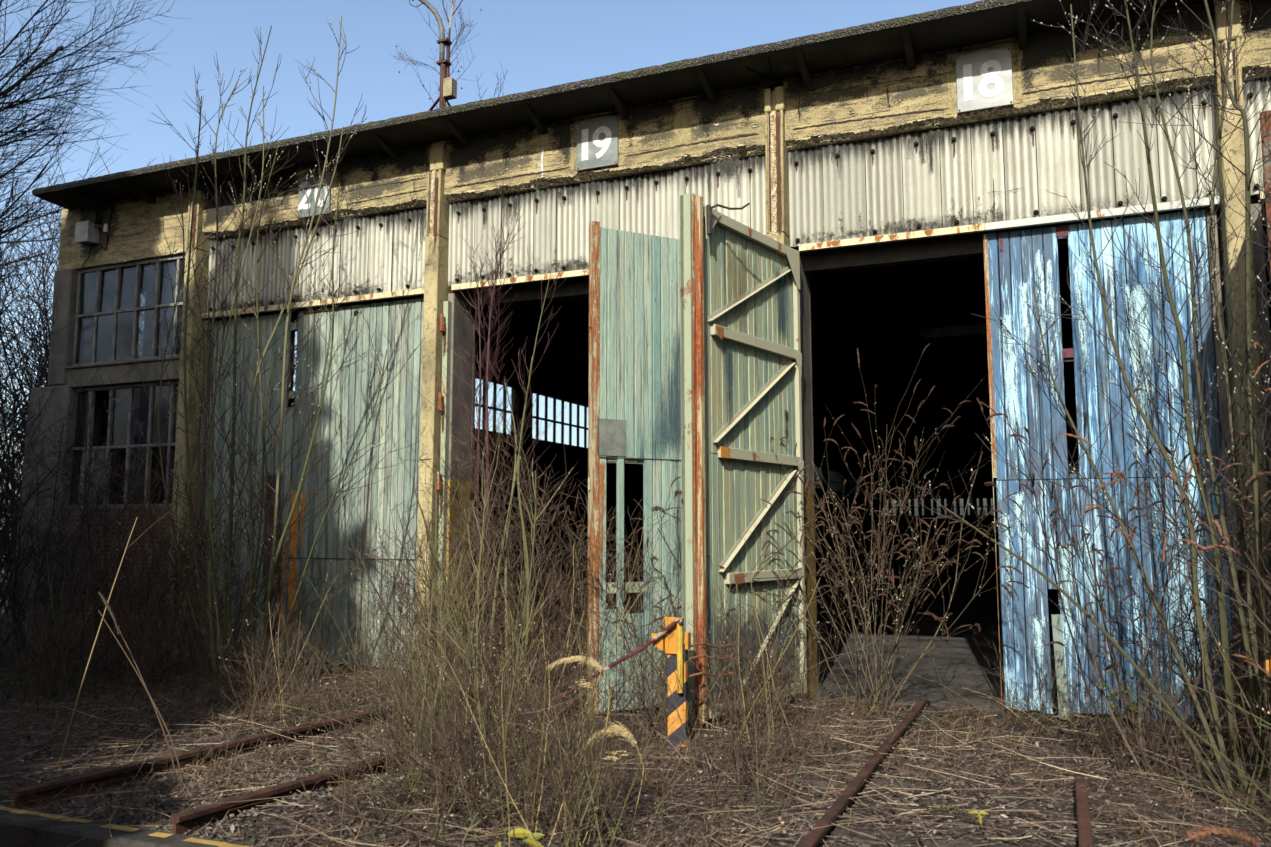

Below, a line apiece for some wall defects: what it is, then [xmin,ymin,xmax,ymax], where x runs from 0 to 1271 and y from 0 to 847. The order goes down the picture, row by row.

water stain [203,144,430,257]
water stain [447,84,765,228]
water stain [785,49,958,116]
water stain [793,192,1004,243]
water stain [790,86,1214,175]
water stain [1011,3,1215,99]
peeling [1001,250,1058,437]
peeling [1074,256,1090,399]
peeling [1124,283,1152,461]